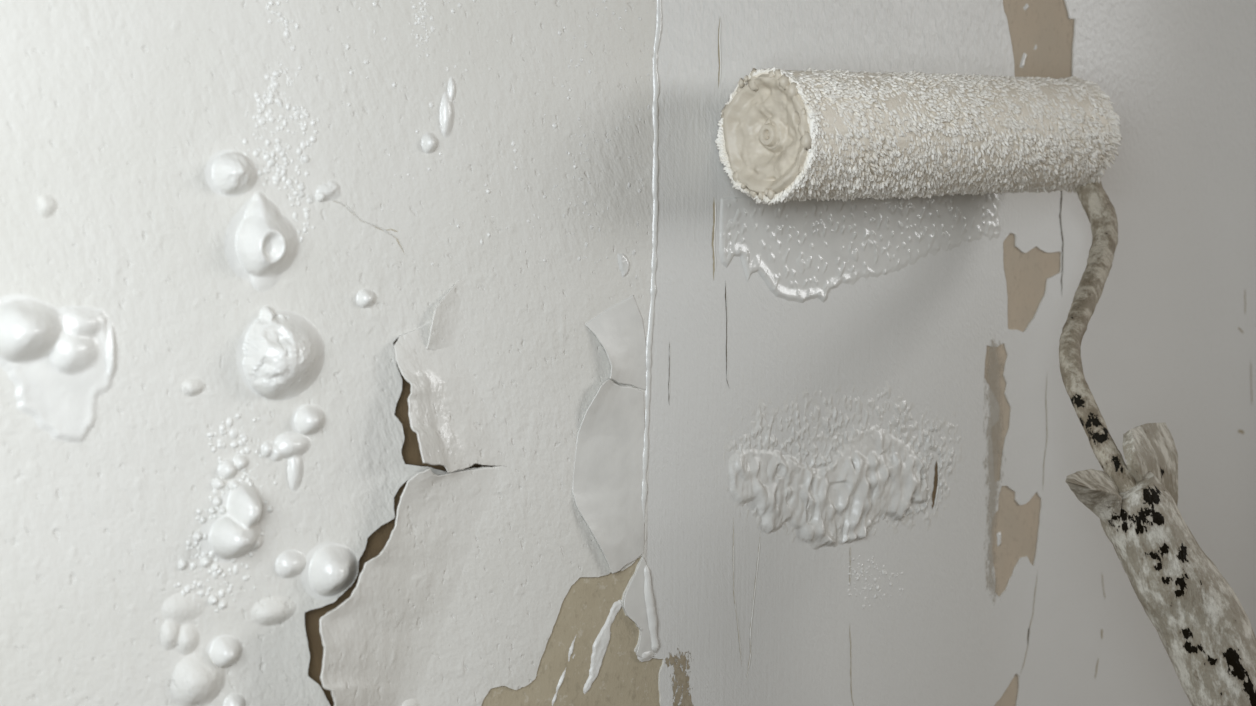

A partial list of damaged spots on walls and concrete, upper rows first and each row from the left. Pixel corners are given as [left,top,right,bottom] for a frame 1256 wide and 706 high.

peeling [585,295,647,390]
peeling [1003,233,1062,332]
peeling [305,279,507,706]
peeling [984,343,1042,597]
peeling [482,556,664,706]
peeling [994,674,1020,706]